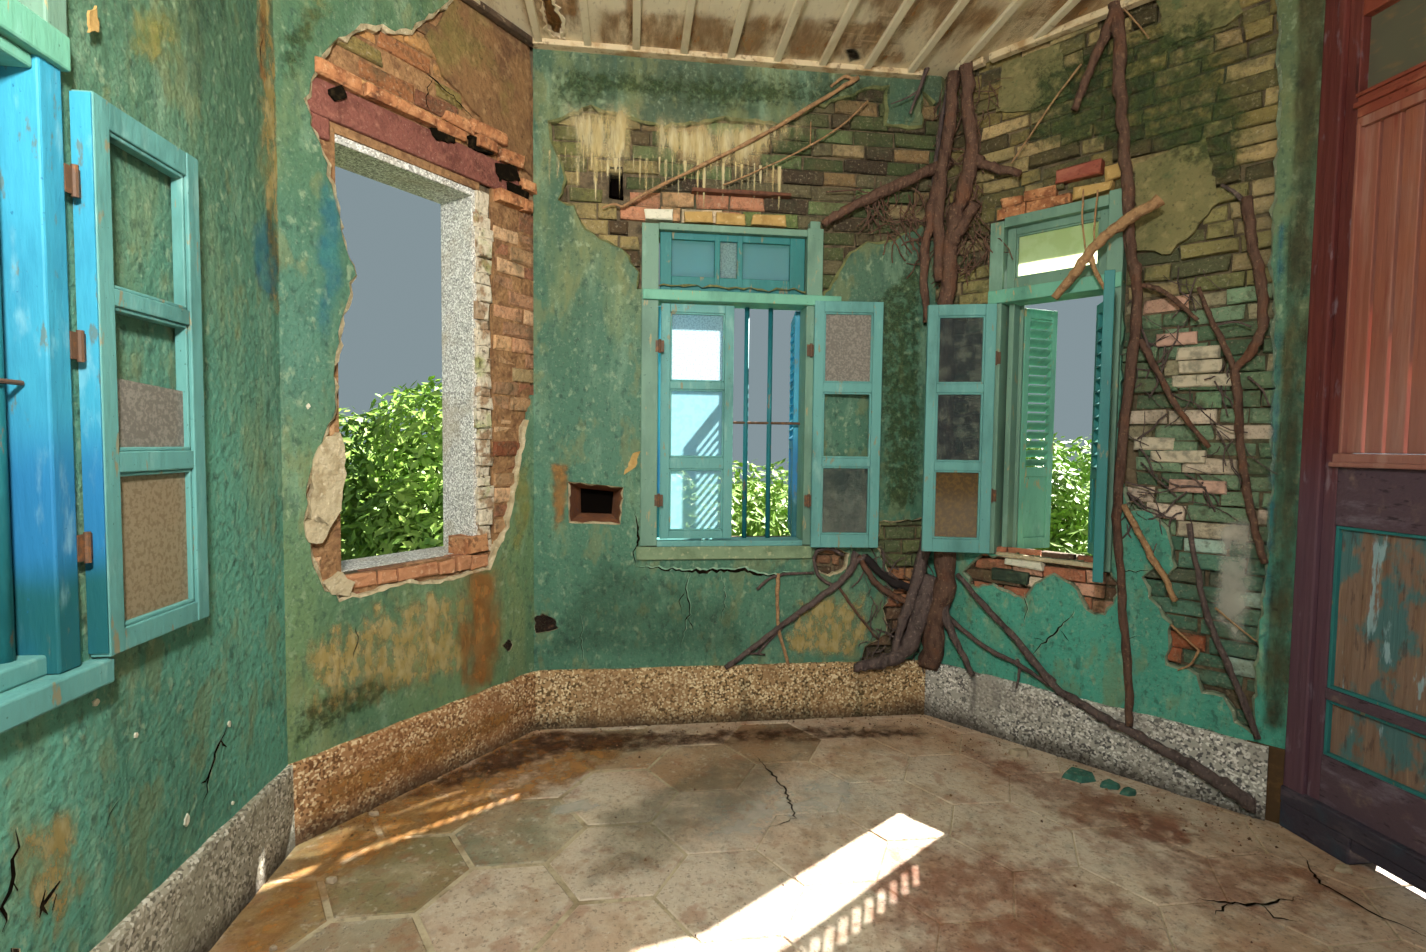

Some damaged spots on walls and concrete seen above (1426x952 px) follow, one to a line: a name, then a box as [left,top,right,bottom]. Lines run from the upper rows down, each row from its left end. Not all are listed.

damp [535,0,575,28]
damp [602,0,996,62]
spalling [303,0,1283,735]
crack [633,516,789,644]
crack [202,725,228,805]
crack [0,828,62,932]